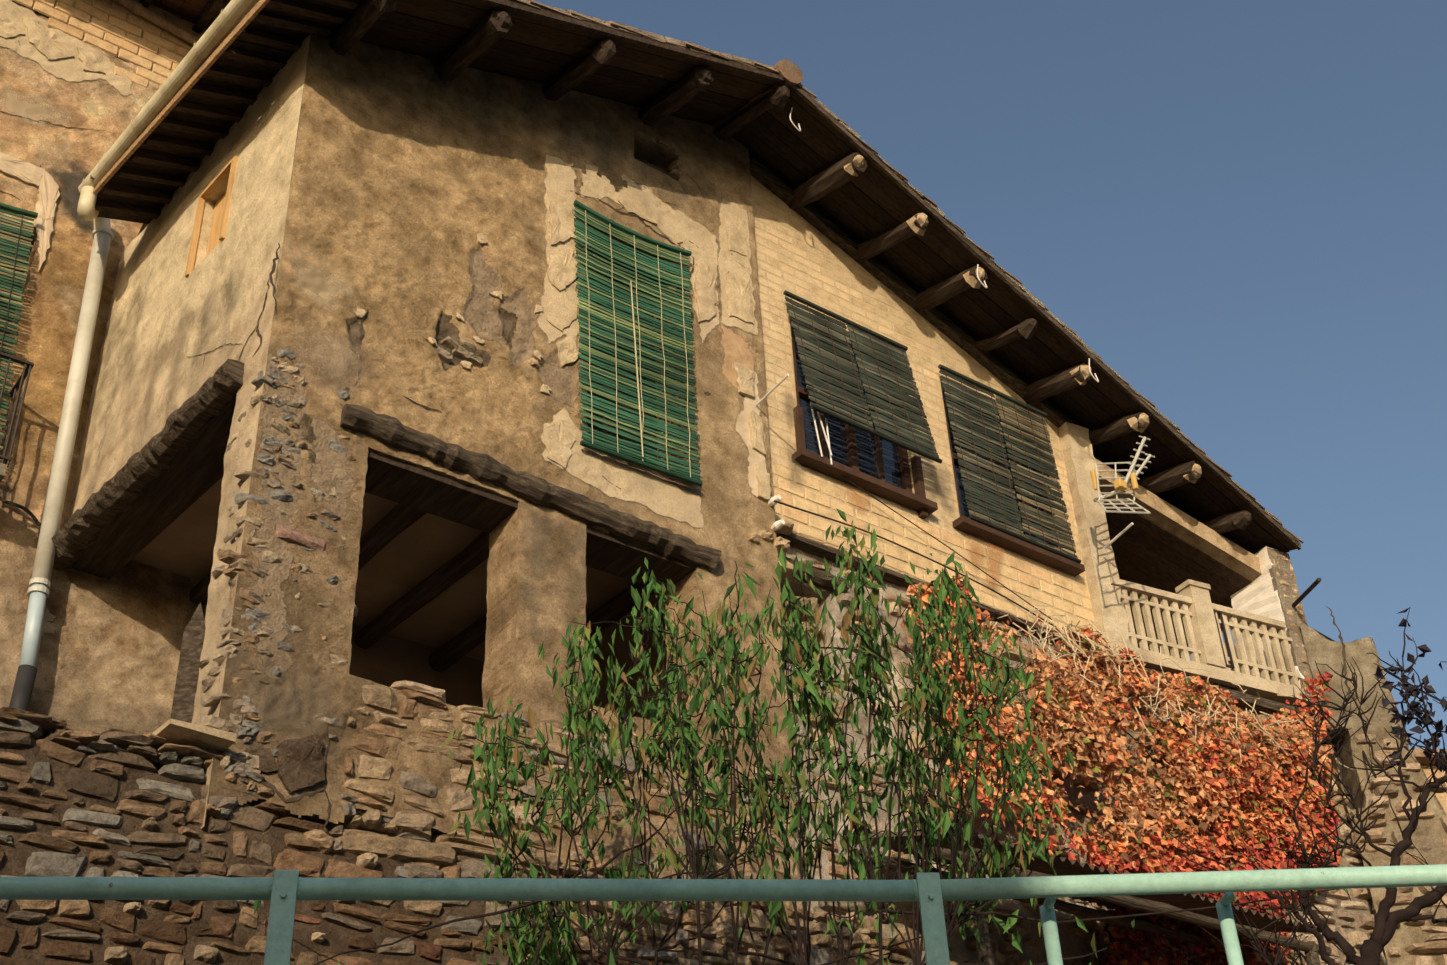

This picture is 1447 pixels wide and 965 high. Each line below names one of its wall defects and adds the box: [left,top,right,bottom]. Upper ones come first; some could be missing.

crack [0,111,106,131]
crack [191,243,280,364]
flaking render [425,154,772,528]
flaking render [245,734,325,794]